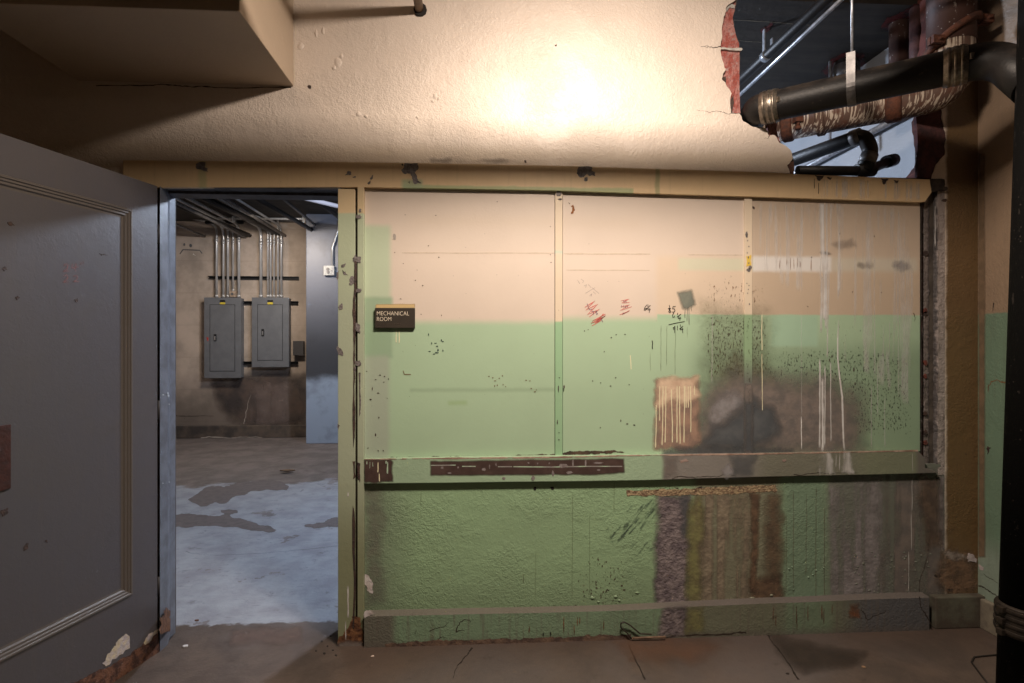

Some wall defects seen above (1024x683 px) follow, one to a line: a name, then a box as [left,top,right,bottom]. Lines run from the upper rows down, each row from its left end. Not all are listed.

flaking render [721,1,742,114]
spalling [914,110,946,179]
peeling [336,255,389,447]
leakage [705,179,911,473]
corrosion [73,607,170,683]
corrosion [337,588,364,646]
peeling [352,508,376,629]
peeling [353,448,393,483]
peeling [431,458,624,480]
leakage [654,493,783,636]
leakage [833,483,881,595]
leakage [894,454,944,594]